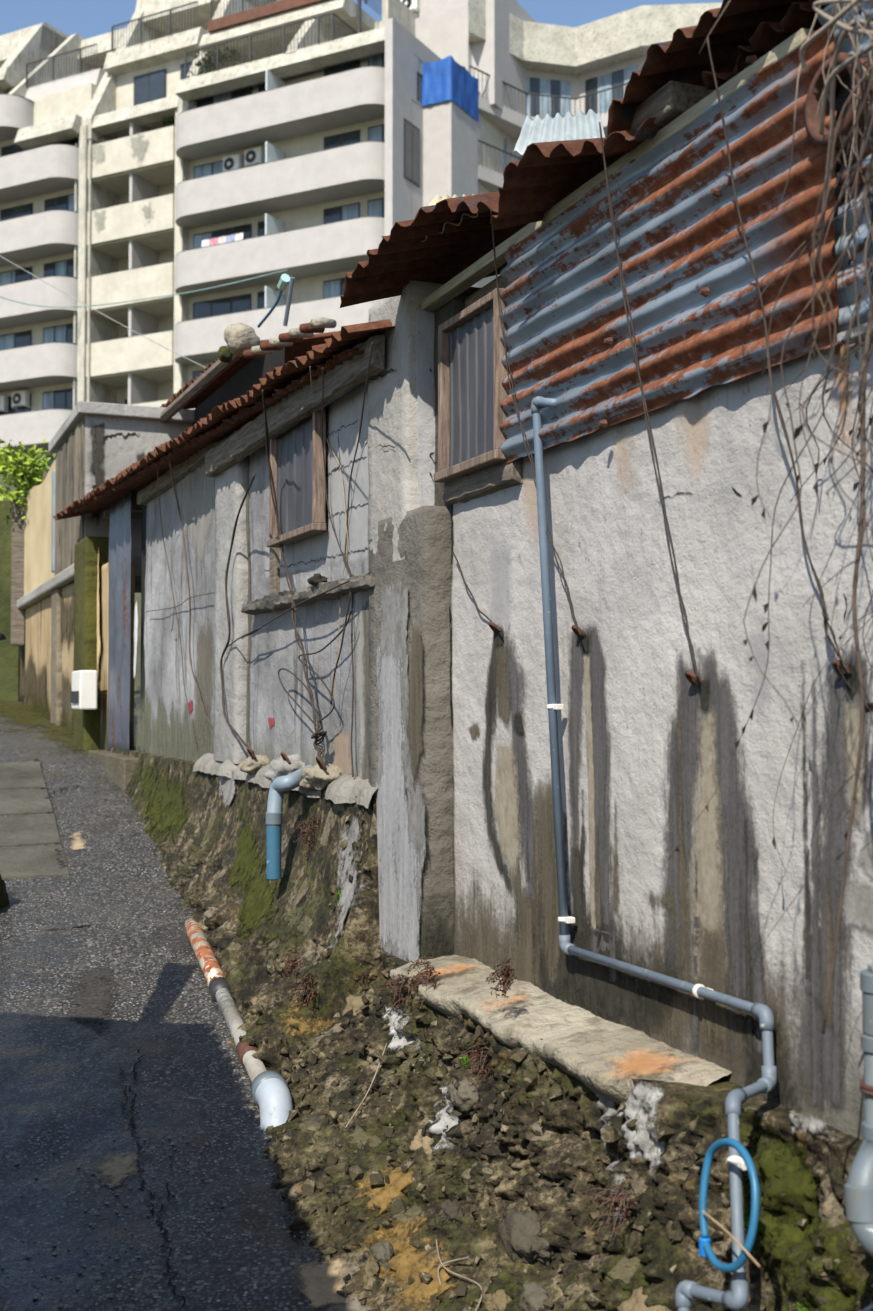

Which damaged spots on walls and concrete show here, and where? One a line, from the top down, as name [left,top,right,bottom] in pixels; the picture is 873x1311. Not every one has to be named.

peeling [330,580,426,962]
leakage [423,626,870,1136]
crack [119,1048,186,1311]